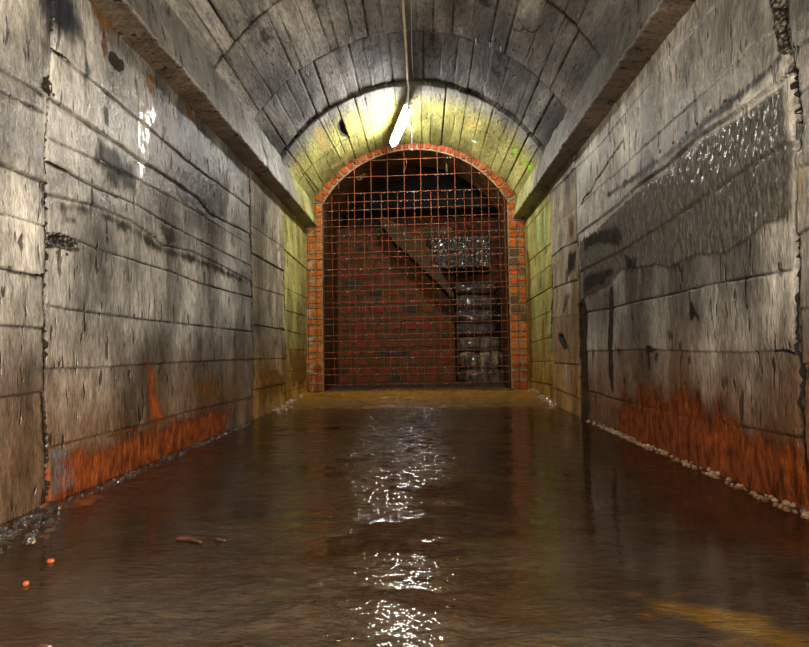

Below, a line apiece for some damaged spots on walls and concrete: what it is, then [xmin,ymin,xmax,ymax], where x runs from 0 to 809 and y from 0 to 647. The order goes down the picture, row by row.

crack [779,41,803,124]
crack [774,238,809,482]